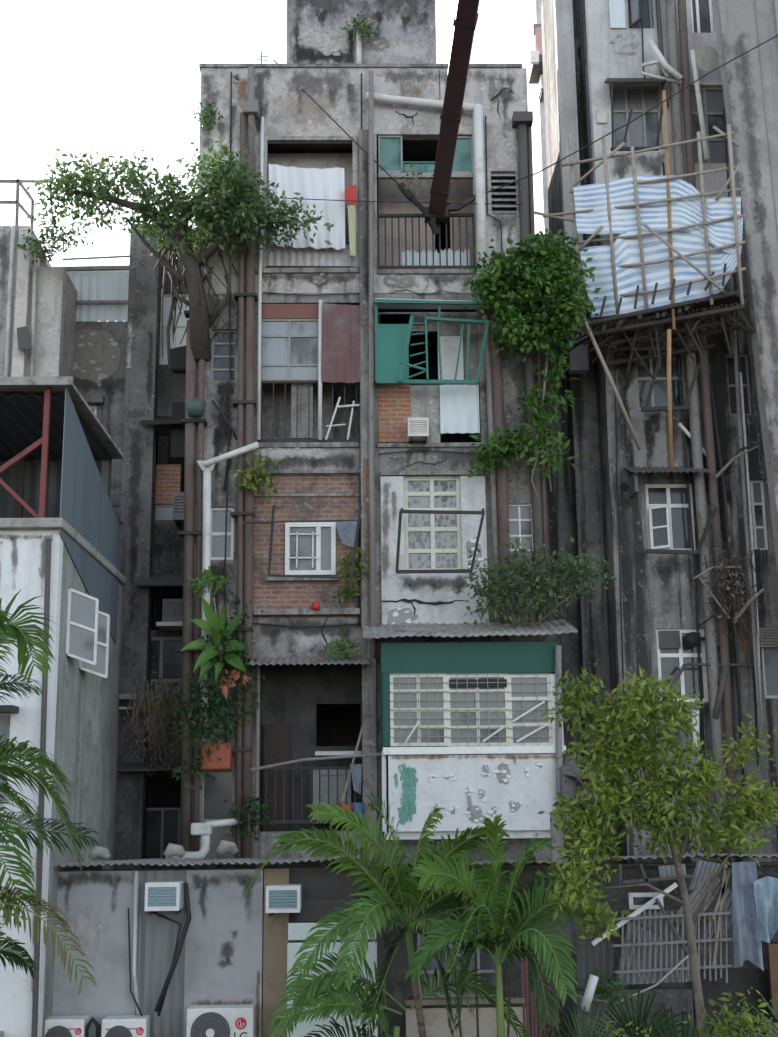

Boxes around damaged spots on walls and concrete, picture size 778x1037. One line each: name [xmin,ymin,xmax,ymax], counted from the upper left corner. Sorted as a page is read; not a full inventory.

water stain [203,76,236,147]
water stain [255,69,270,131]
water stain [722,37,766,248]
water stain [746,235,778,405]
spalling [73,325,135,387]
water stain [703,332,736,541]
water stain [0,535,52,577]
peeling [388,608,418,624]
crack [382,598,465,615]
peeling [394,764,418,825]
peeling [431,774,497,823]
peeling [481,761,510,784]